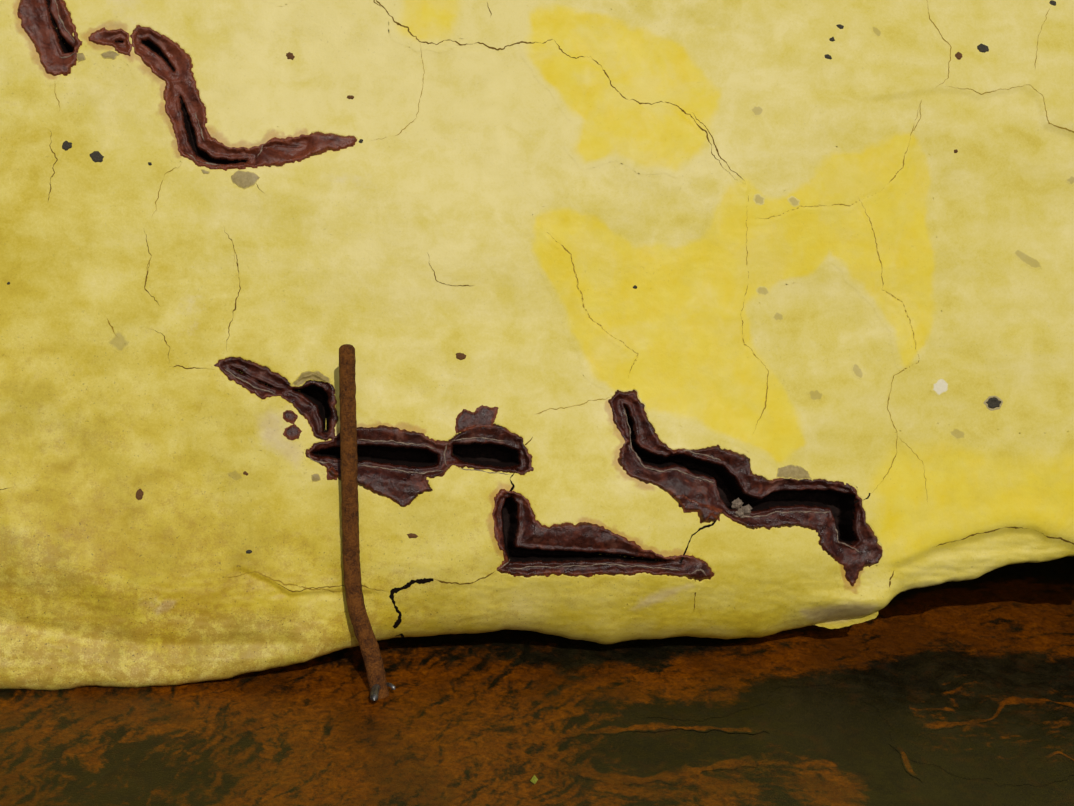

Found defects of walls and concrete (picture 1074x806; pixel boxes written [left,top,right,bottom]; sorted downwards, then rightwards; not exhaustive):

peeling [89,151,104,162]
peeling [244,398,312,476]
crack [7,0,1074,639]
corrosion [0,562,1074,806]